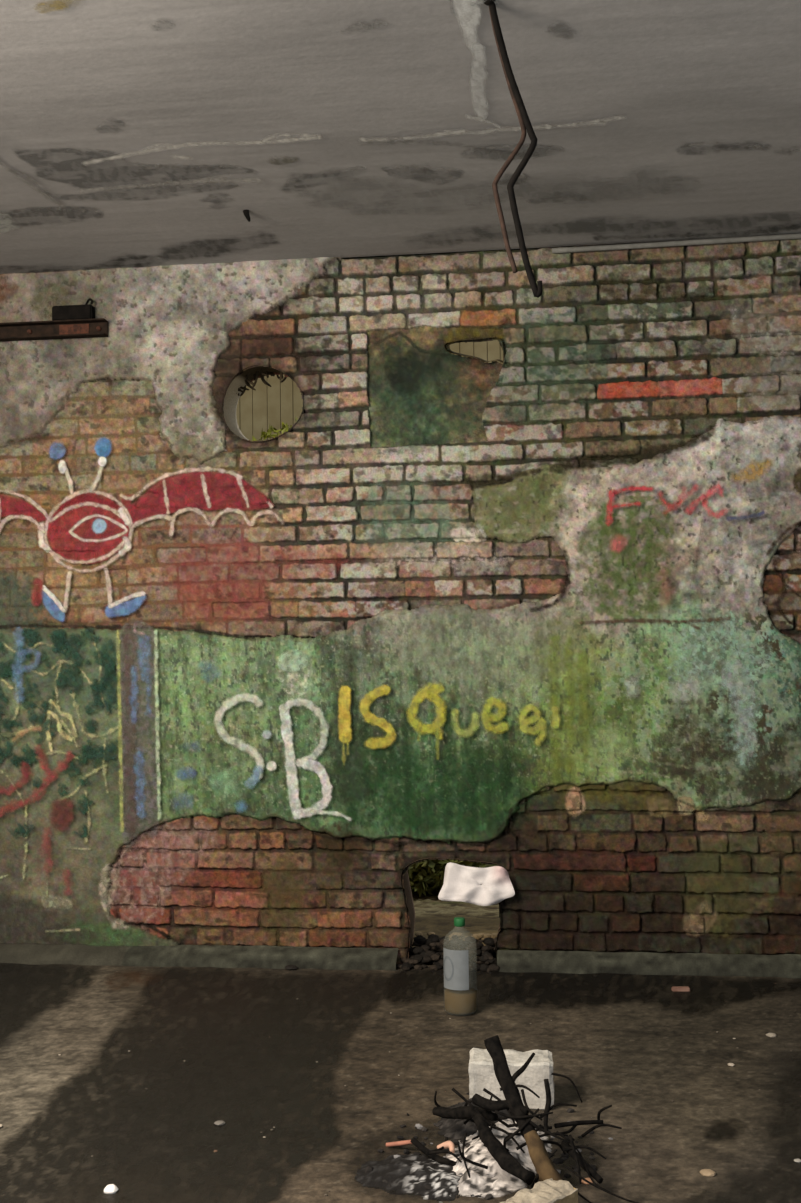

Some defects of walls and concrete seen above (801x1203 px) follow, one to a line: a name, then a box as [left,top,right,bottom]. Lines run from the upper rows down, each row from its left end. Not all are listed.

water stain [447,0,500,134]
water stain [88,239,239,270]
water stain [541,221,673,233]
flaking render [0,239,801,838]
flaking render [104,777,801,965]